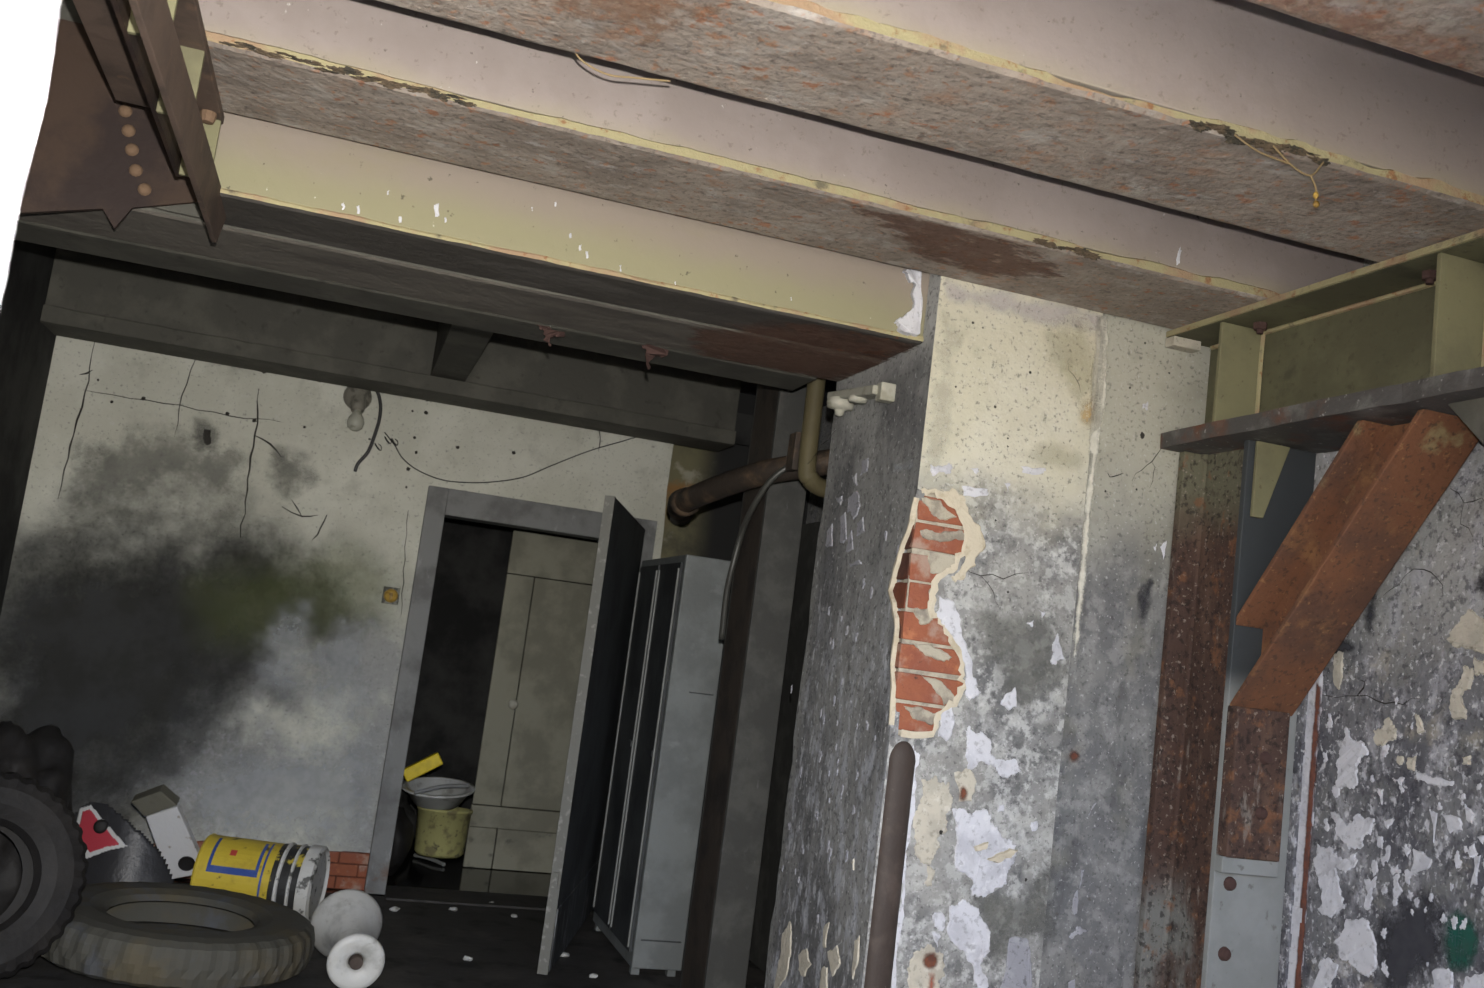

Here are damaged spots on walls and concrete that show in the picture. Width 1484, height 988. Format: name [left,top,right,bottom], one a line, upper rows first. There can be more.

corrosion [857,206,1064,279]
damp [91,423,228,492]
crack [58,342,281,536]
crack [283,500,327,540]
peeling [1050,633,1064,665]
peeling [1333,651,1344,690]
peeling [1447,609,1484,720]
peeling [814,678,859,820]
flaking render [825,458,1027,988]
peeling [1312,697,1484,988]
peeling [774,914,860,988]